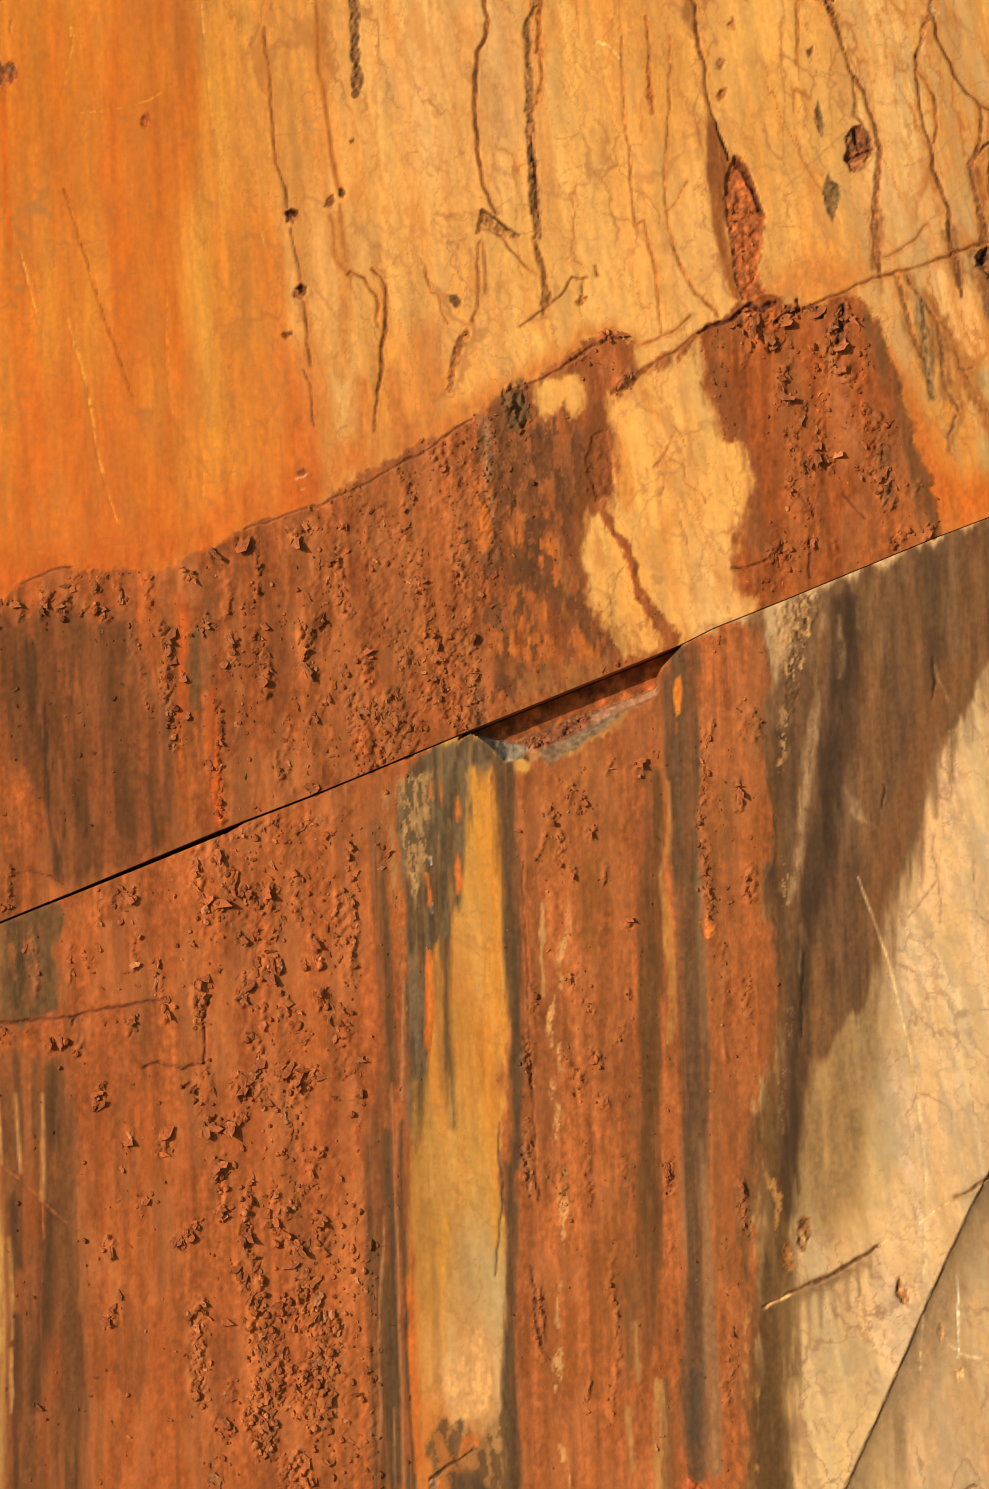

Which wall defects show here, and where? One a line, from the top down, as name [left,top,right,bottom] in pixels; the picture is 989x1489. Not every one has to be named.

spalling [0,60,18,89]
crack [262,26,316,427]
crack [348,0,365,99]
crack [244,265,475,531]
corrosion [0,0,755,660]
crack [425,0,600,328]
crack [505,0,989,460]
spalling [822,123,875,222]
damp [0,598,180,1489]
corrosion [404,768,511,1489]
damp [615,309,989,1489]
crack [759,1172,989,1489]